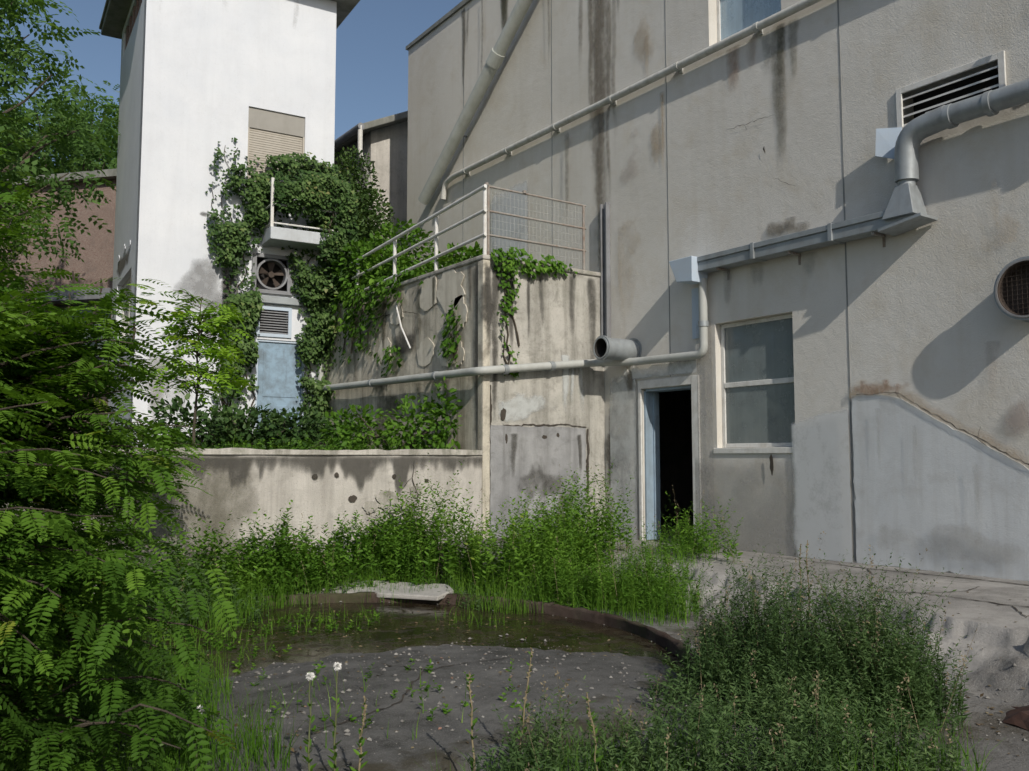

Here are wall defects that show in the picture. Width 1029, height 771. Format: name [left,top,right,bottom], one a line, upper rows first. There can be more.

leakage [589,0,611,188]
leakage [767,217,806,234]
peeling [378,337,391,369]
peeling [390,301,403,325]
peeling [417,269,468,367]
leakage [144,456,482,571]